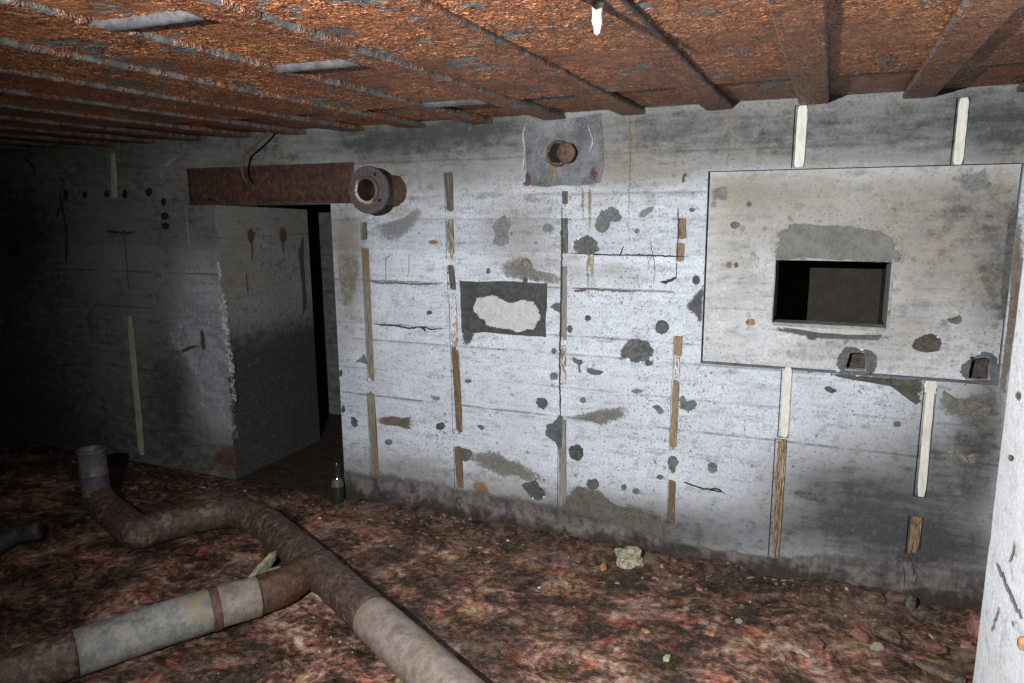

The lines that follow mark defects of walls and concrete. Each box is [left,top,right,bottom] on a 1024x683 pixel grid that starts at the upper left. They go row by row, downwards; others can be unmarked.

peeling [492,216,511,246]
spalling [543,207,622,254]
crack [375,323,442,331]
spalling [620,338,654,366]
spalling [836,347,877,375]
crack [684,482,726,495]
leakage [344,471,986,611]